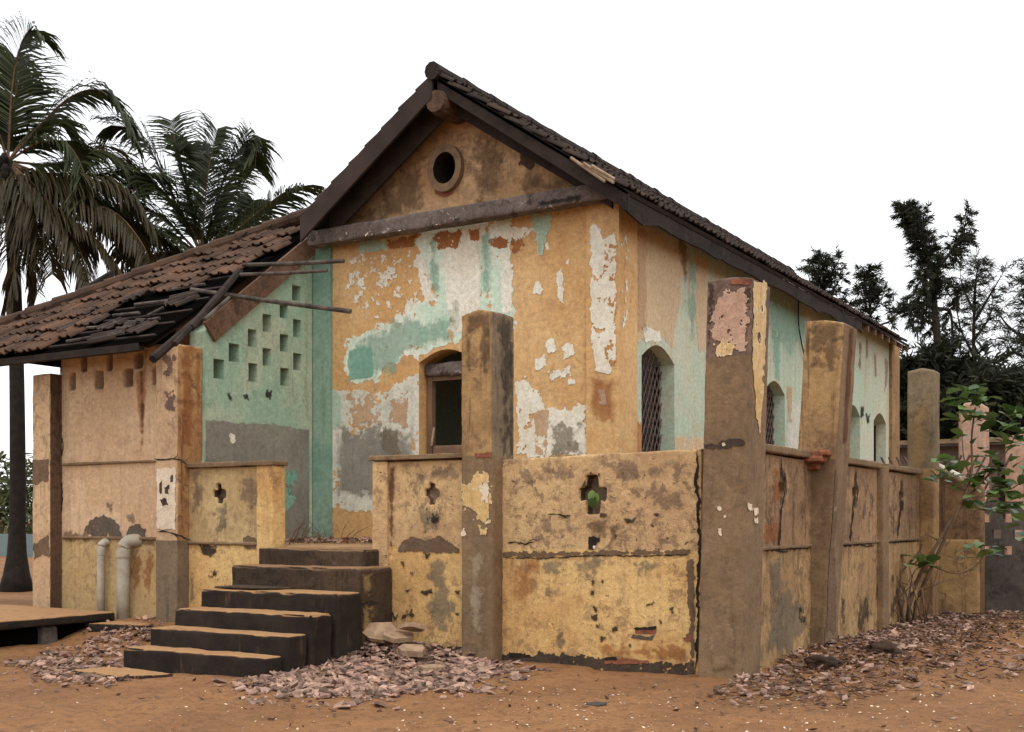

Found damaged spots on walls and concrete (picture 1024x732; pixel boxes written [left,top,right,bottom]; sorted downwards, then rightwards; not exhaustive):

peeling [332,218,534,513]
peeling [515,338,586,458]
peeling [589,223,767,433]
peeling [156,467,176,530]
peeling [398,471,492,554]
crack [694,438,746,672]
crack [765,459,811,553]
crack [843,471,919,547]